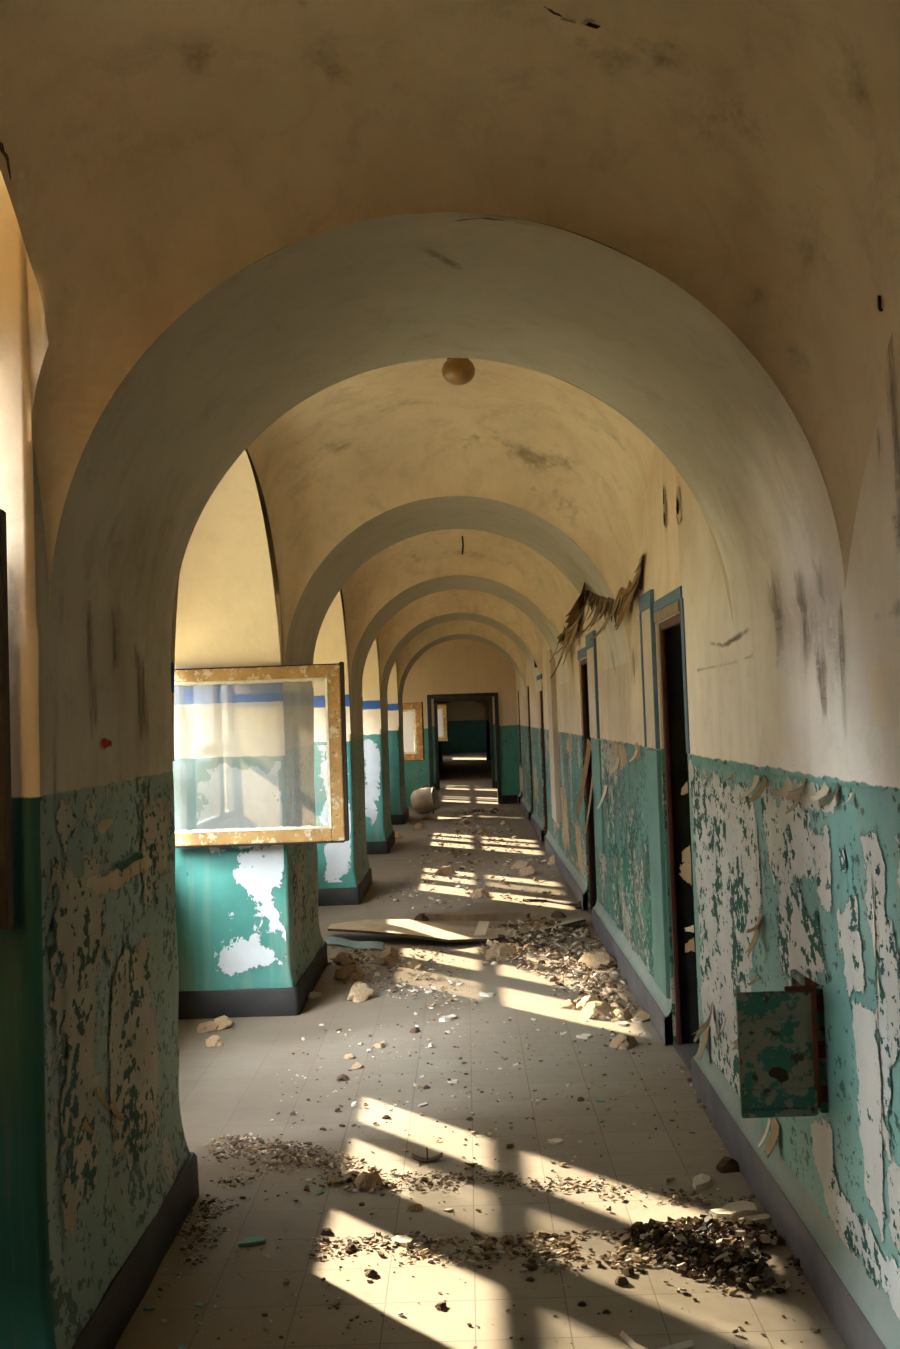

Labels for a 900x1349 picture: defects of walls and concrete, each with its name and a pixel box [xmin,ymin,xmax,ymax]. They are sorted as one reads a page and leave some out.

crack [0,142,33,215]
peeling [549,552,644,680]
peeling [194,739,381,976]
peeling [519,735,654,978]
peeling [679,757,900,1320]